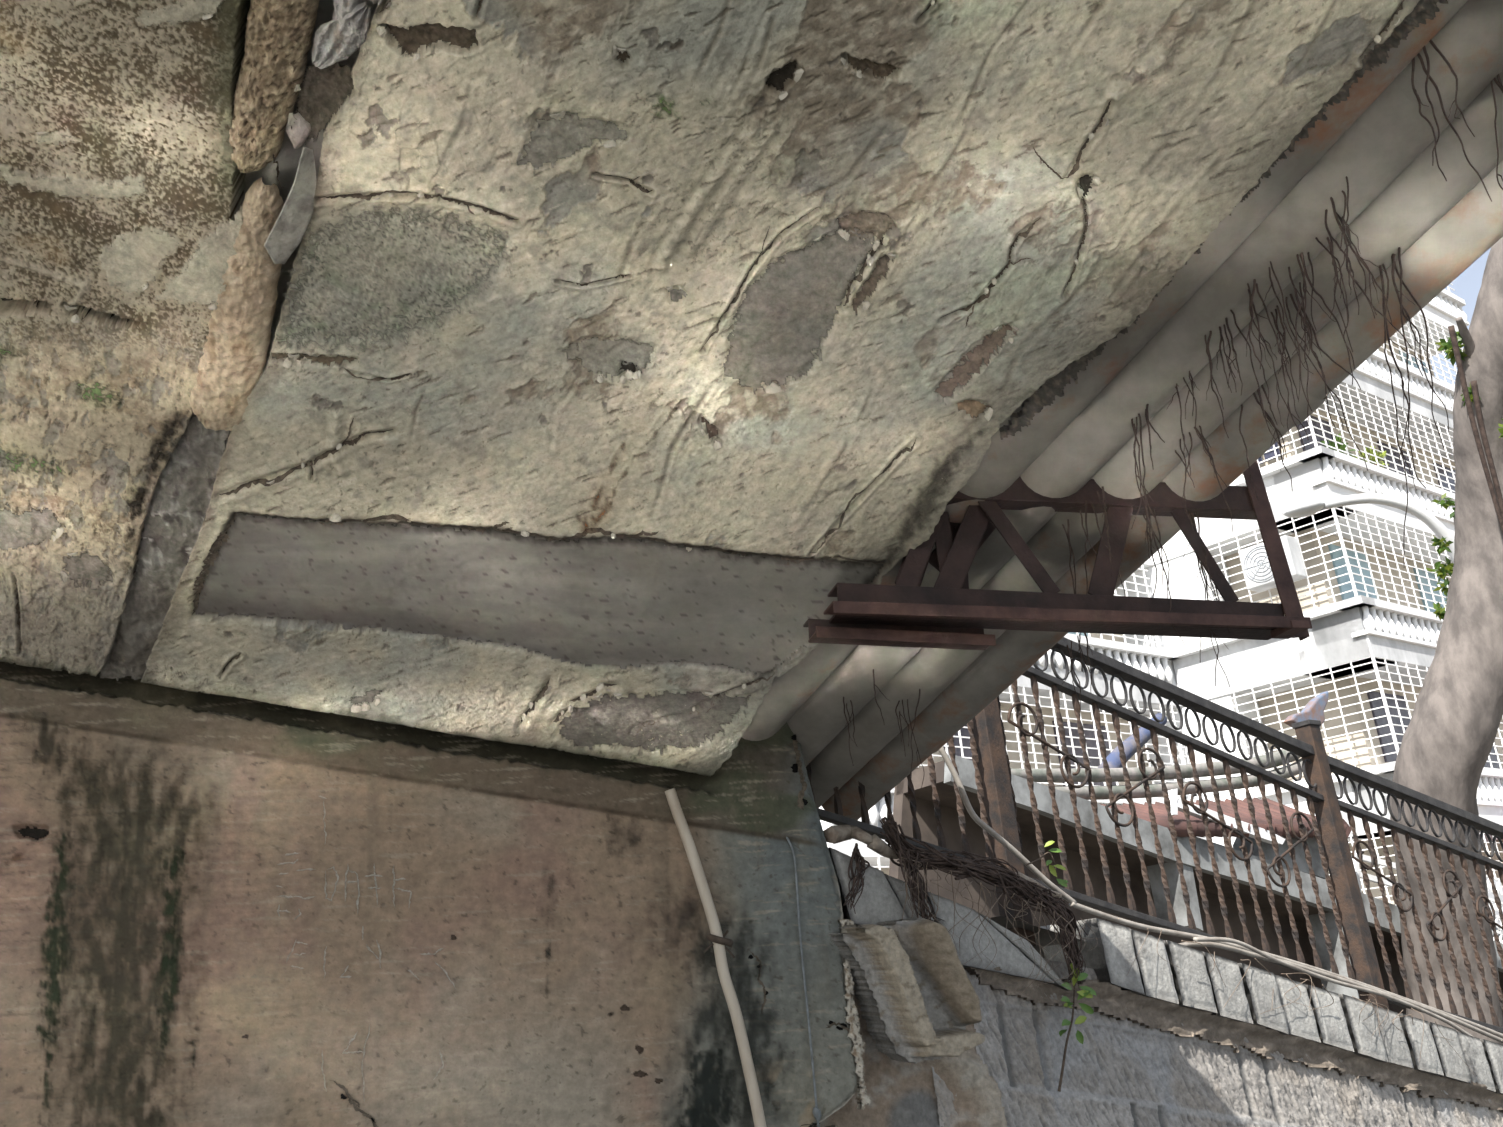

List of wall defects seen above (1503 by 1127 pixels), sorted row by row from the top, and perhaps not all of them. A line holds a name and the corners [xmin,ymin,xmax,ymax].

peeling [516,111,627,170]
spalling [766,60,804,100]
crack [1033,101,1111,293]
crack [704,208,816,345]
peeling [723,210,896,394]
crack [843,237,884,306]
crack [941,219,1039,328]
peeling [934,325,1019,421]
crack [192,418,916,615]
peeling [559,690,751,755]
water stain [36,722,200,1127]
water stain [677,923,783,1127]